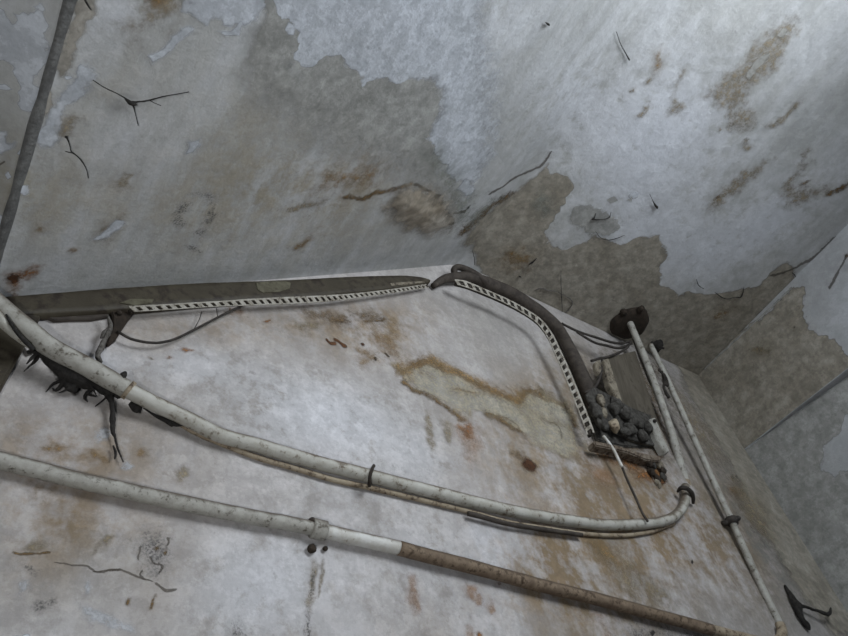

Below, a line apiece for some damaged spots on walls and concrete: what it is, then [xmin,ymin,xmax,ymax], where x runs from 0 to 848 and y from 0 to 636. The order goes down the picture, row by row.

peeling [0,4,50,112]
peeling [38,0,96,146]
peeling [182,0,497,199]
peeling [715,24,792,122]
crack [344,183,431,201]
corrosion [7,266,38,294]
leakage [394,355,578,458]
peeling [464,164,848,636]
corrosion [510,452,536,471]
crack [14,544,177,592]